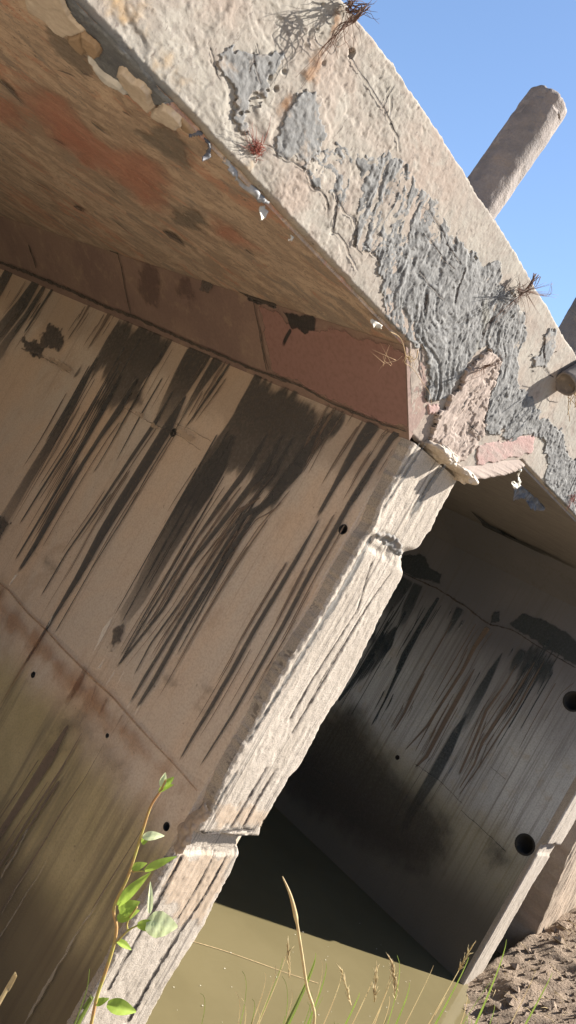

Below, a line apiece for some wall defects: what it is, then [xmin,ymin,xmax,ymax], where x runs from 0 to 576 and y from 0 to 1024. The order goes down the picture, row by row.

peeling [25,0,196,134]
water stain [0,265,230,661]
crack [0,245,492,514]
water stain [97,374,399,763]
spalling [216,44,285,135]
water stain [247,296,315,344]
crack [269,145,381,271]
crack [249,536,575,739]
spalling [275,88,576,517]
water stain [294,554,576,861]